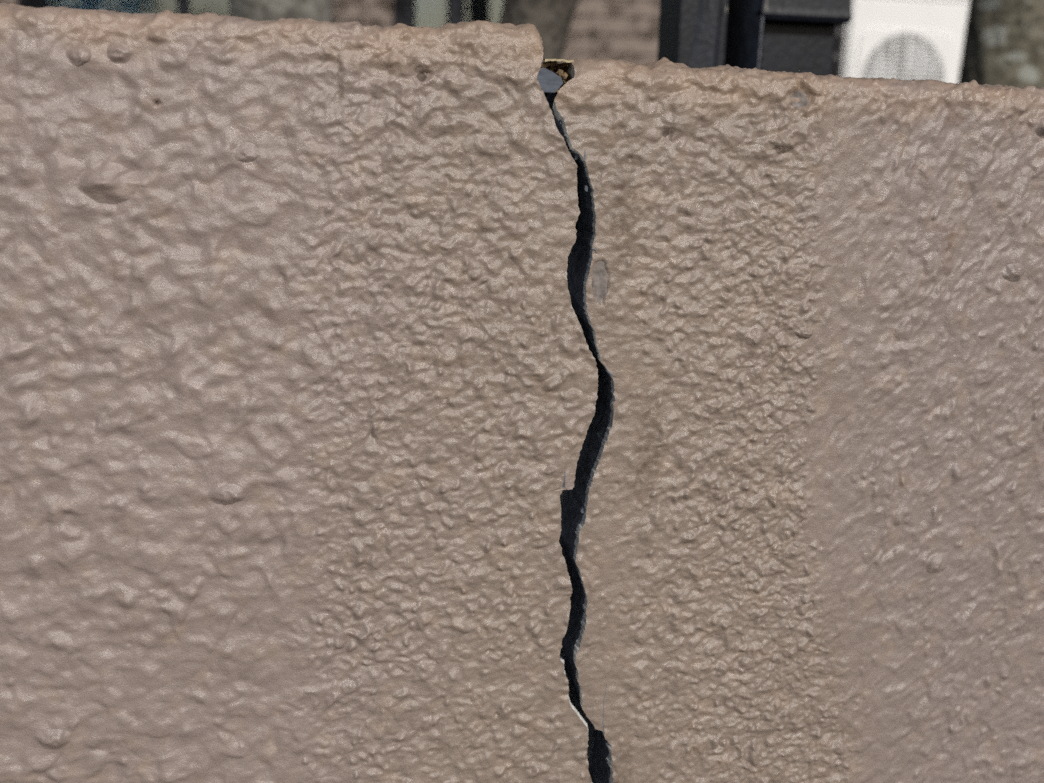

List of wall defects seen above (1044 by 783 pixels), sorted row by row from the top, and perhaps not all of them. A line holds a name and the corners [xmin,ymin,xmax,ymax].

crack [538,62,616,783]